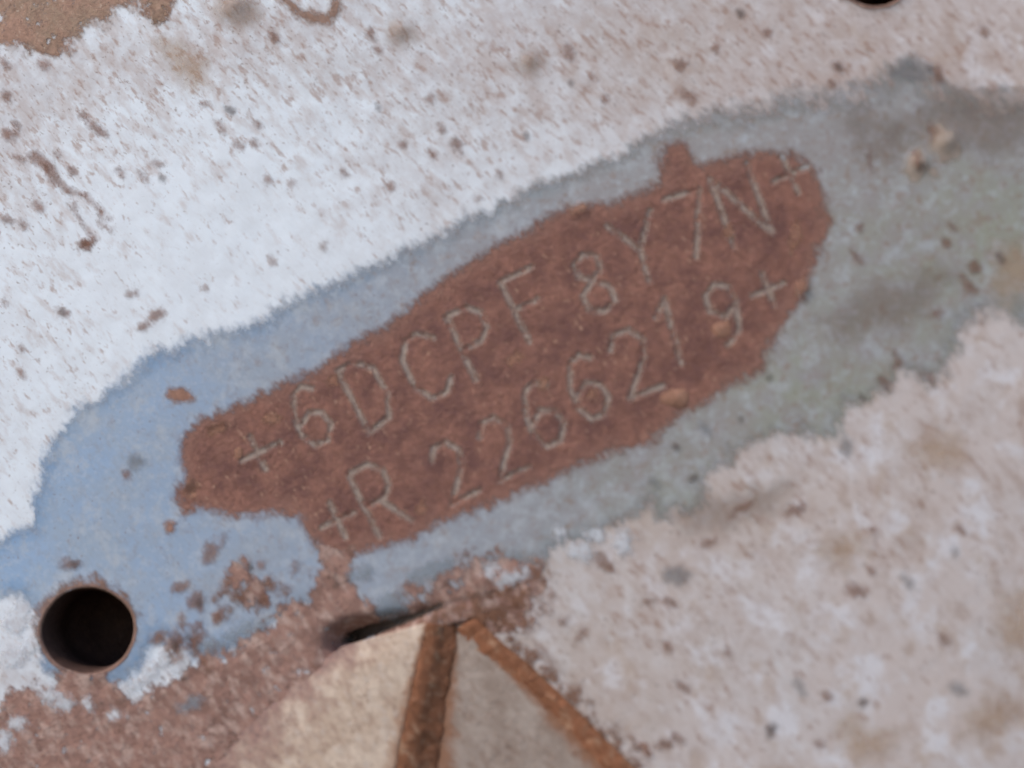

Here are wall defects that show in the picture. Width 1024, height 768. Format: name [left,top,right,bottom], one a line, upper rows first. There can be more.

rust [0,142,832,768]
peeling [409,560,450,582]
peeling [496,566,529,586]
peeling [380,593,401,616]
peeling [169,657,190,677]
peeling [40,687,92,711]
peeling [0,718,25,752]